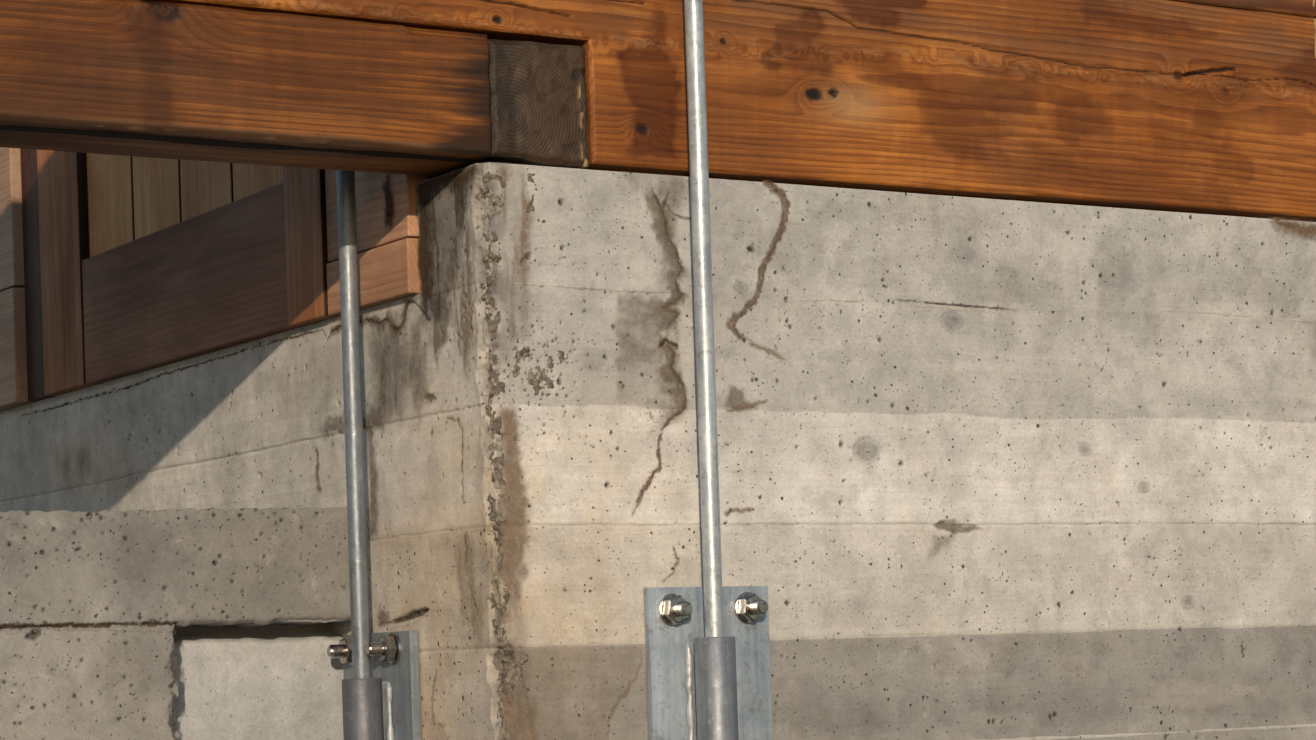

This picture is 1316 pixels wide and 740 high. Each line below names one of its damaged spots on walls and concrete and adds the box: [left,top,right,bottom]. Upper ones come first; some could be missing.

crack [21,300,431,423]
damp [412,165,475,400]
damp [515,196,529,274]
crack [637,192,691,501]
crack [727,180,790,356]
crack [1273,217,1316,239]
spalling [475,172,565,740]
crack [0,621,177,633]